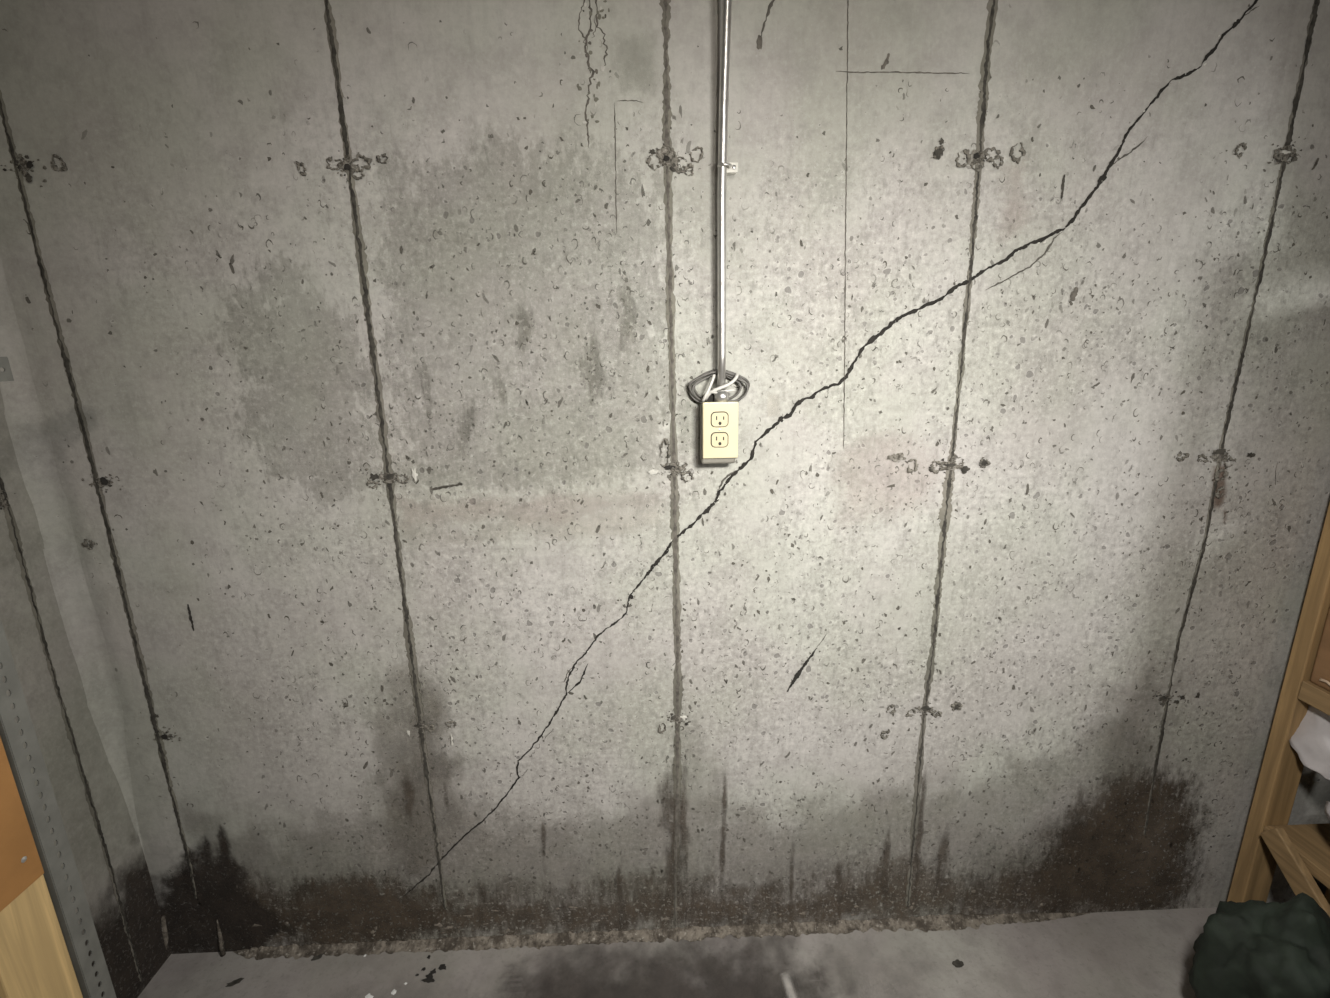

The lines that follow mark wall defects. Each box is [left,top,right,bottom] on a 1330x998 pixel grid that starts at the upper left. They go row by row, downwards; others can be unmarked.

damp [85,773,1196,998]
crack [403,0,1259,897]